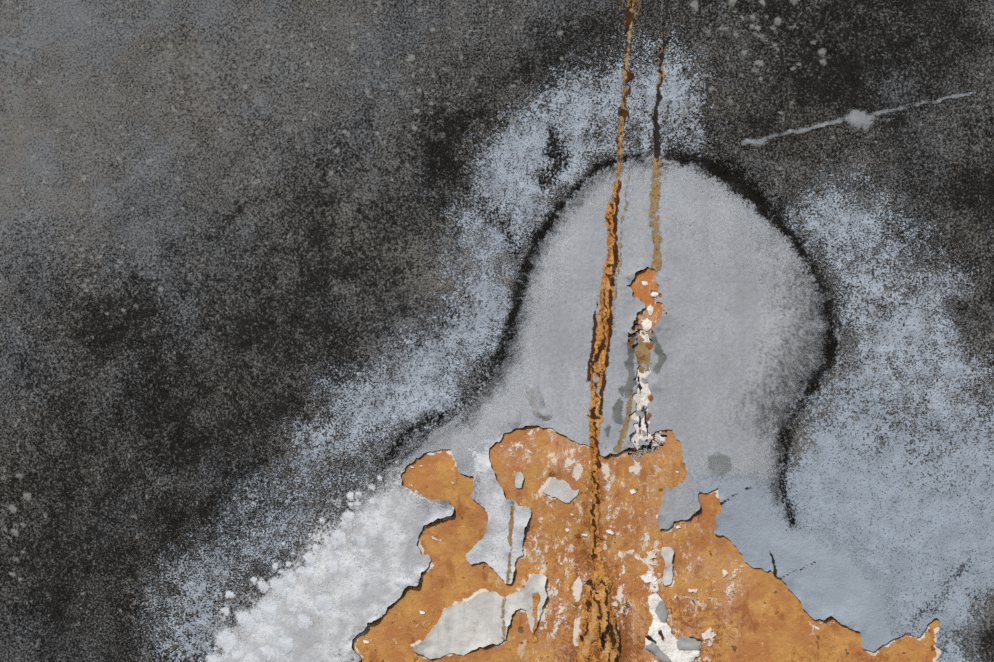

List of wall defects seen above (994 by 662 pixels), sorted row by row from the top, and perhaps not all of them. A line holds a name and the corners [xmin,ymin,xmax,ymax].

leakage [465,423,531,584]
corrosion [559,0,643,662]
peeling [352,267,941,662]
corrosion [648,157,662,271]